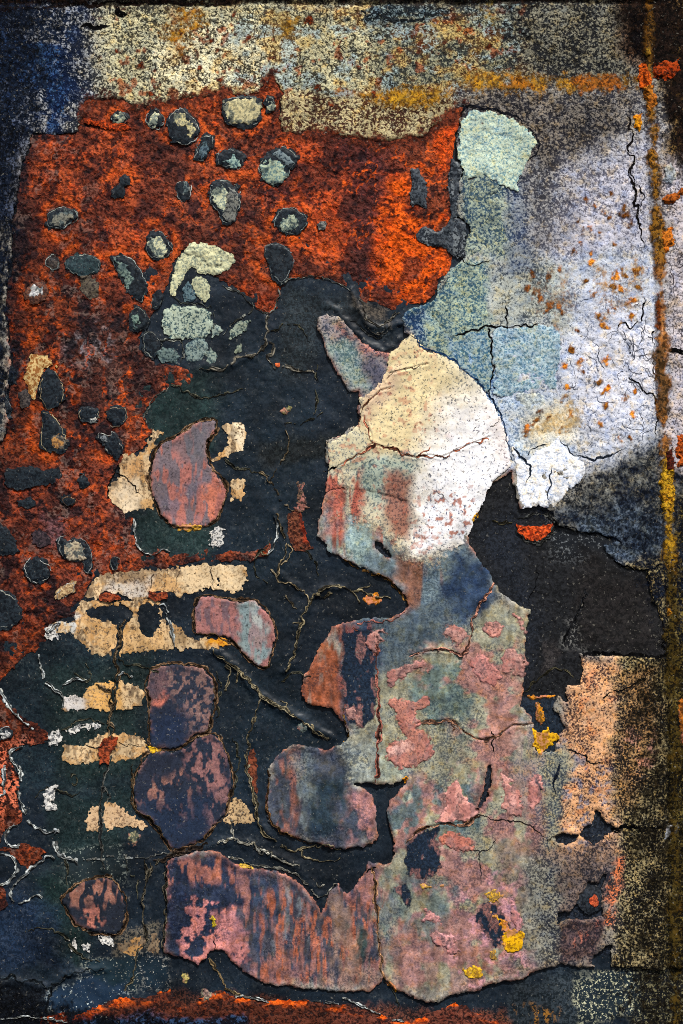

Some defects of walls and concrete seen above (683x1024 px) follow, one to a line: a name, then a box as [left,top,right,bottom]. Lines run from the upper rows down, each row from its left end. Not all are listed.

rust [0,55,466,681]
peeling [0,242,683,1024]
crack [35,254,683,998]
rust [525,267,563,315]
rust [583,197,634,229]
crack [626,116,647,255]
rust [595,0,683,1024]
rust [47,989,511,1024]